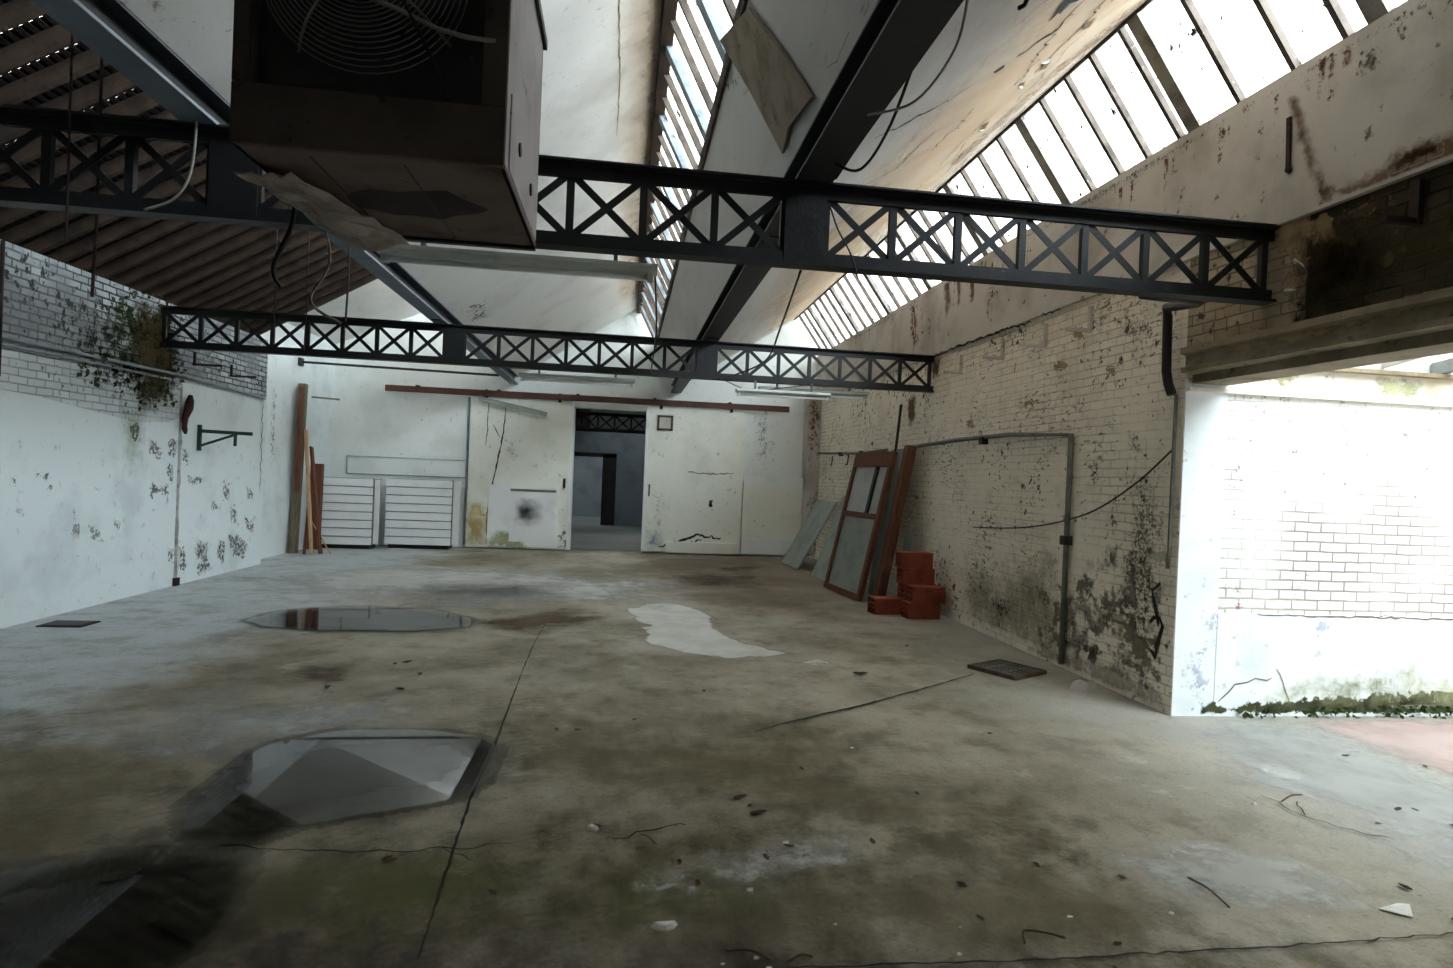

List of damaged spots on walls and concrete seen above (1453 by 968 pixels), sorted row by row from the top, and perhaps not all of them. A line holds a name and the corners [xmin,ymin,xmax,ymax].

leakage [1308,36,1377,75]
leakage [1340,136,1453,194]
peeling [130,422,204,500]
peeling [167,481,254,576]
leakage [1033,476,1165,686]